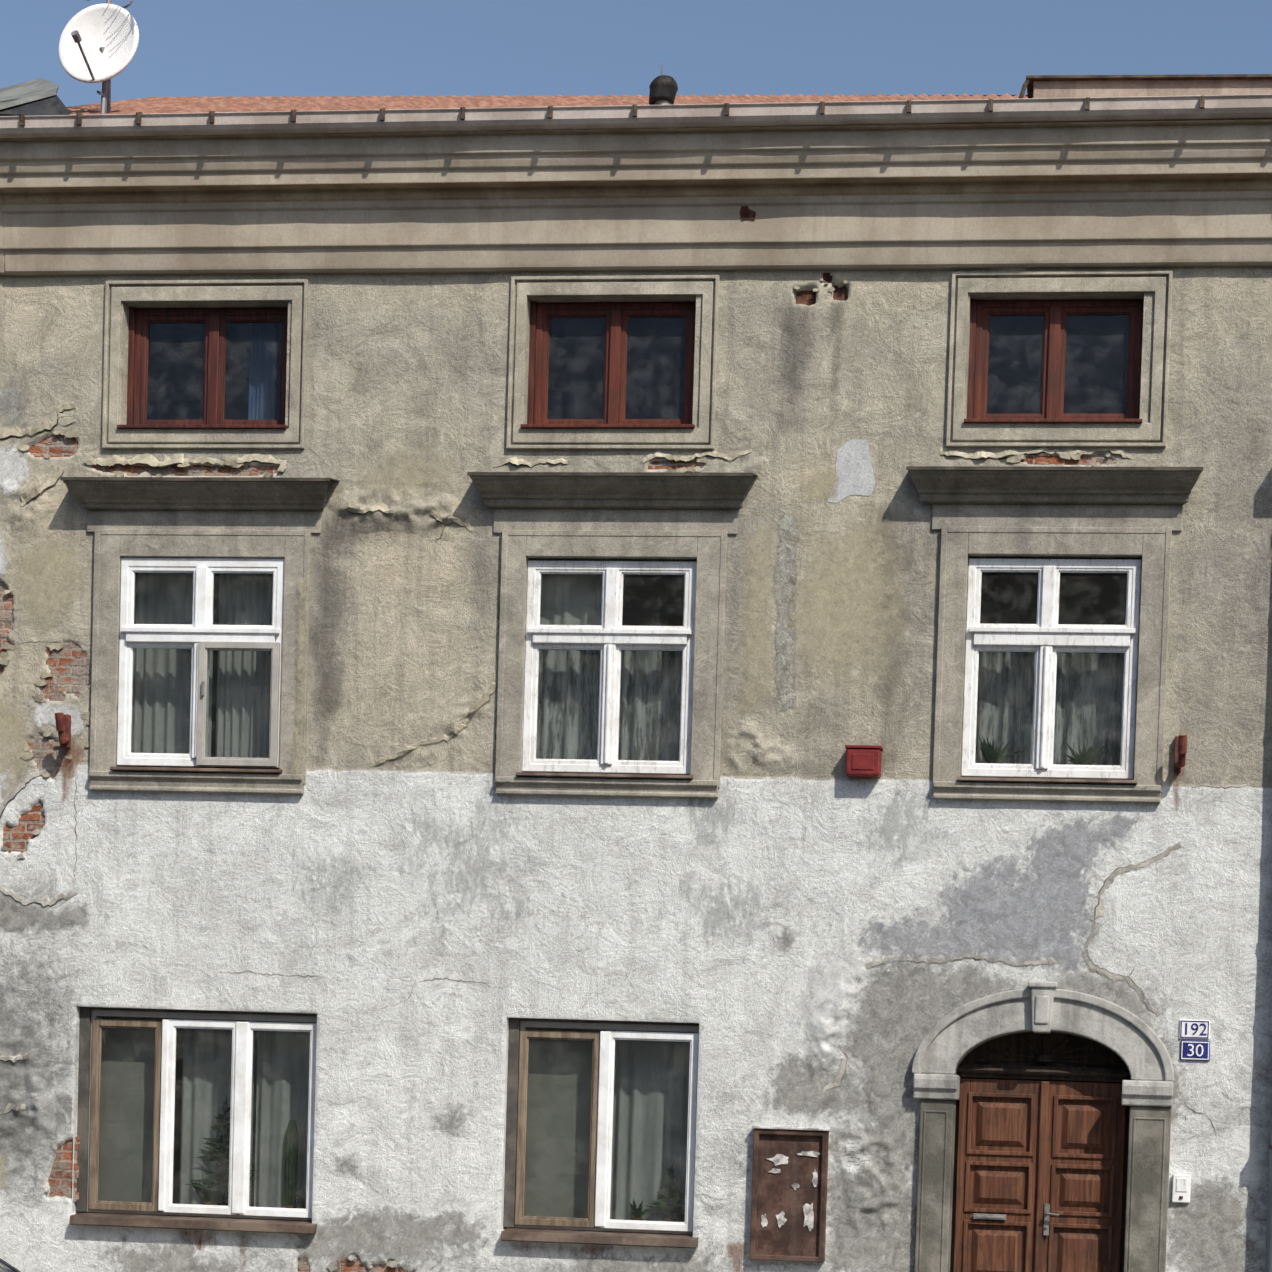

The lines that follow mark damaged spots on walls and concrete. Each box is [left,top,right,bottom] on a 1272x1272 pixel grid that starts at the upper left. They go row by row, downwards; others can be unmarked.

flaking render [794,273,848,306]
crack [0,401,76,440]
flaking render [0,382,287,495]
flaking render [648,456,706,472]
flaking render [827,439,875,503]
flaking render [20,641,92,781]
crack [369,564,501,768]
flaking render [1,801,45,859]
crack [0,766,78,908]
damp [858,810,1139,970]
crack [865,843,1181,1018]
flaking render [259,1208,487,1272]